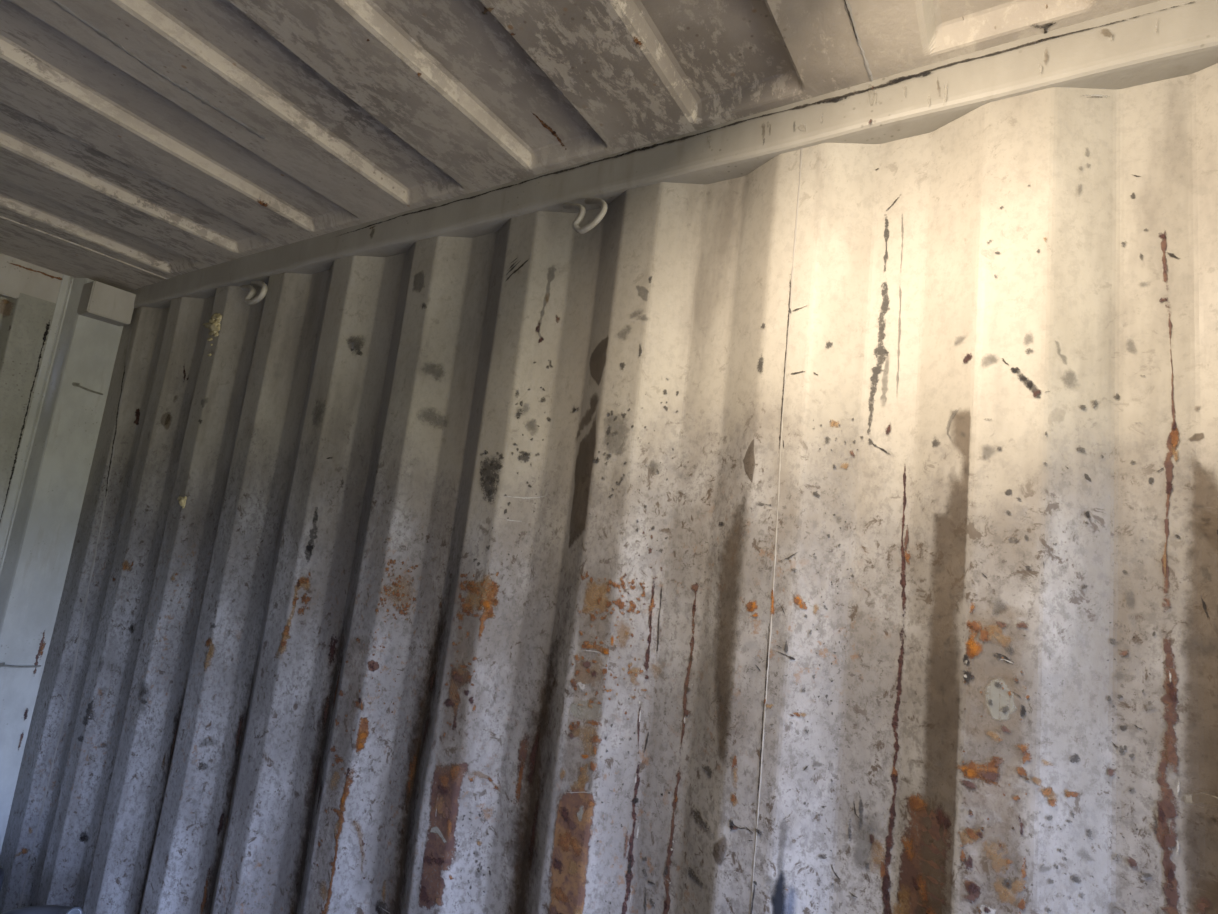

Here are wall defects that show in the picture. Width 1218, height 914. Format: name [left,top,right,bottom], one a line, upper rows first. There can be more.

corrosion [966,603,1029,659]
corrosion [382,572,499,914]
corrosion [509,571,647,914]
corrosion [960,719,1079,807]
corrosion [893,793,1027,914]